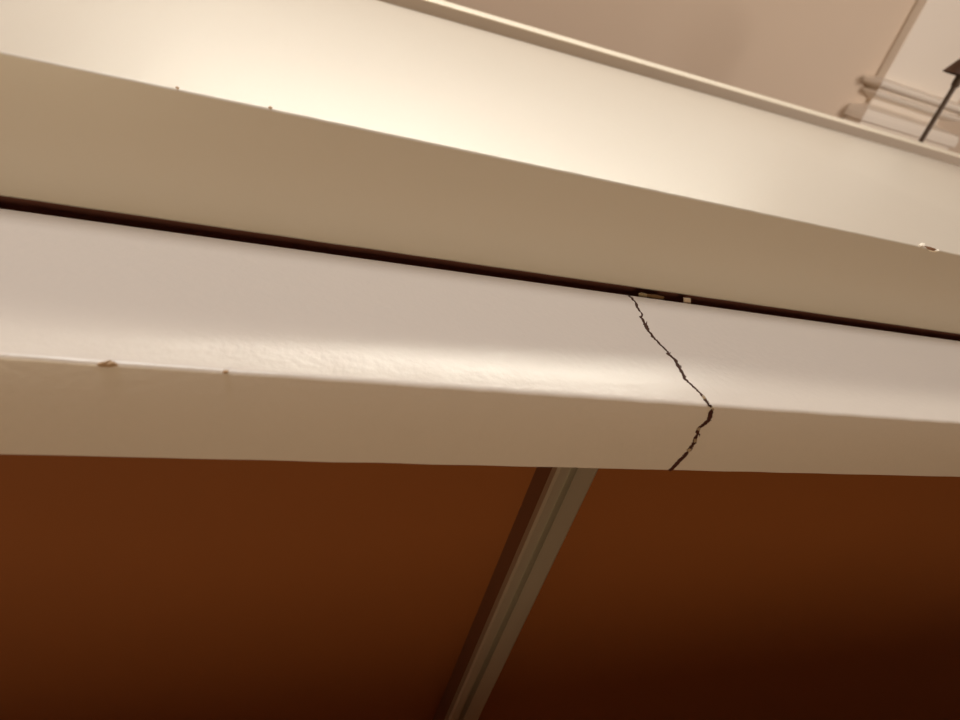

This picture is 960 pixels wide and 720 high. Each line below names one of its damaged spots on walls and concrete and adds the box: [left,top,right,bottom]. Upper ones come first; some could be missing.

crack [629,296,714,471]